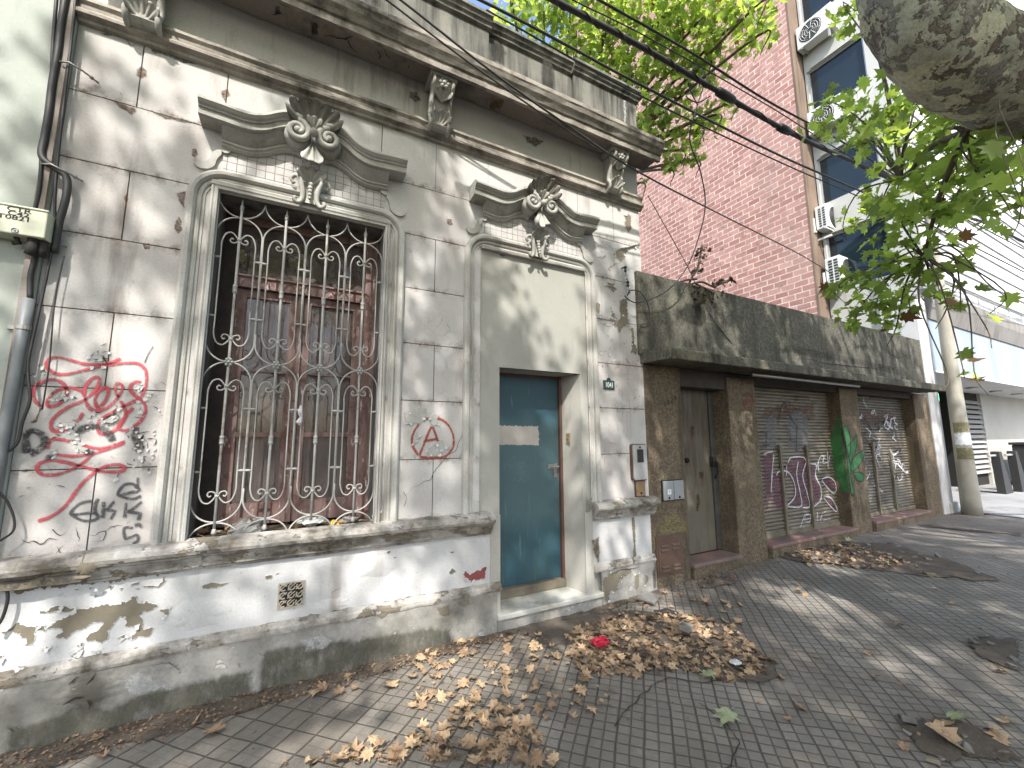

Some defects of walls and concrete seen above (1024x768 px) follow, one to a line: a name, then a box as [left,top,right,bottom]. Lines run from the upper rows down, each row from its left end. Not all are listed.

peeling [596,245,639,387]
peeling [85,343,110,370]
peeling [49,391,77,402]
peeling [49,405,123,459]
peeling [113,383,163,482]
peeling [0,560,171,659]
peeling [449,566,487,584]
spalling [602,569,649,603]
damp [7,629,451,753]